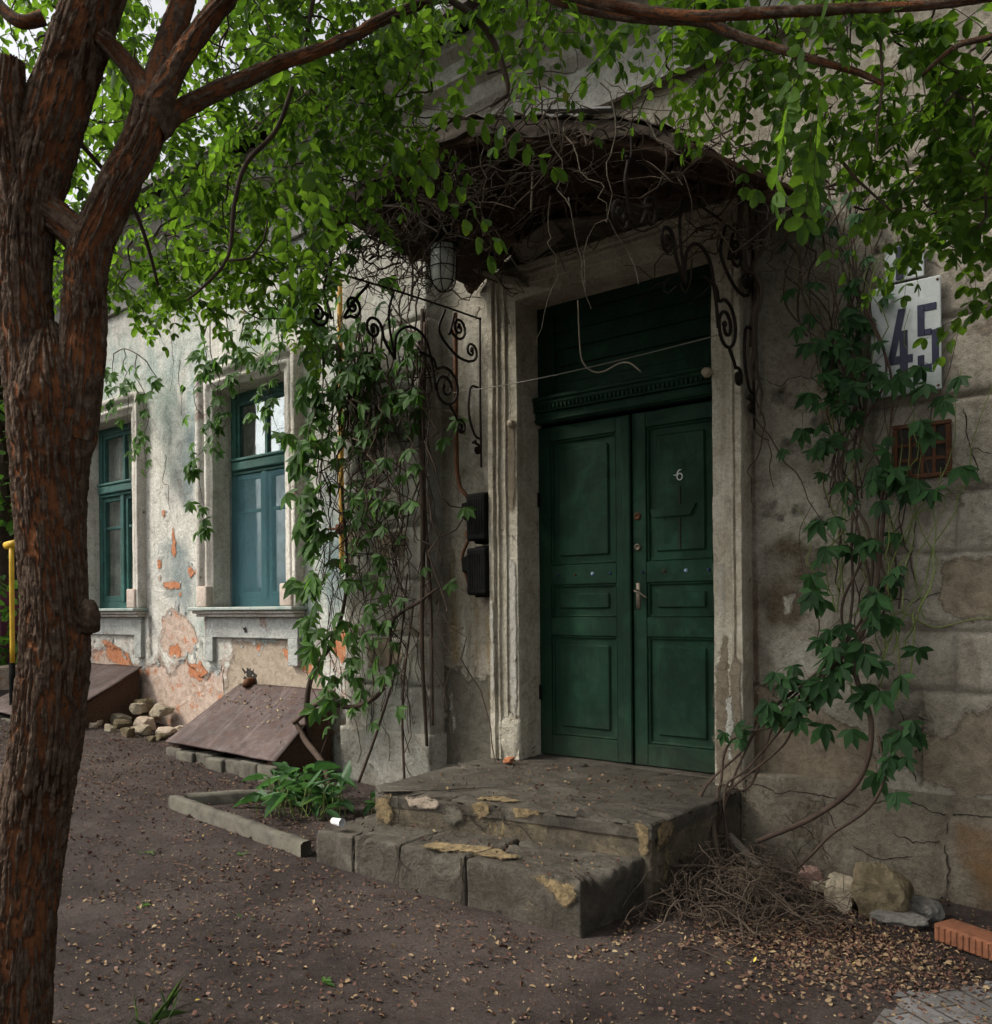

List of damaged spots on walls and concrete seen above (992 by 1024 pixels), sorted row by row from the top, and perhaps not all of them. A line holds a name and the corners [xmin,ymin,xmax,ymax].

flaking render [91,527,322,727]
spalling [535,874,576,906]
spalling [634,821,675,856]
crack [745,772,992,899]